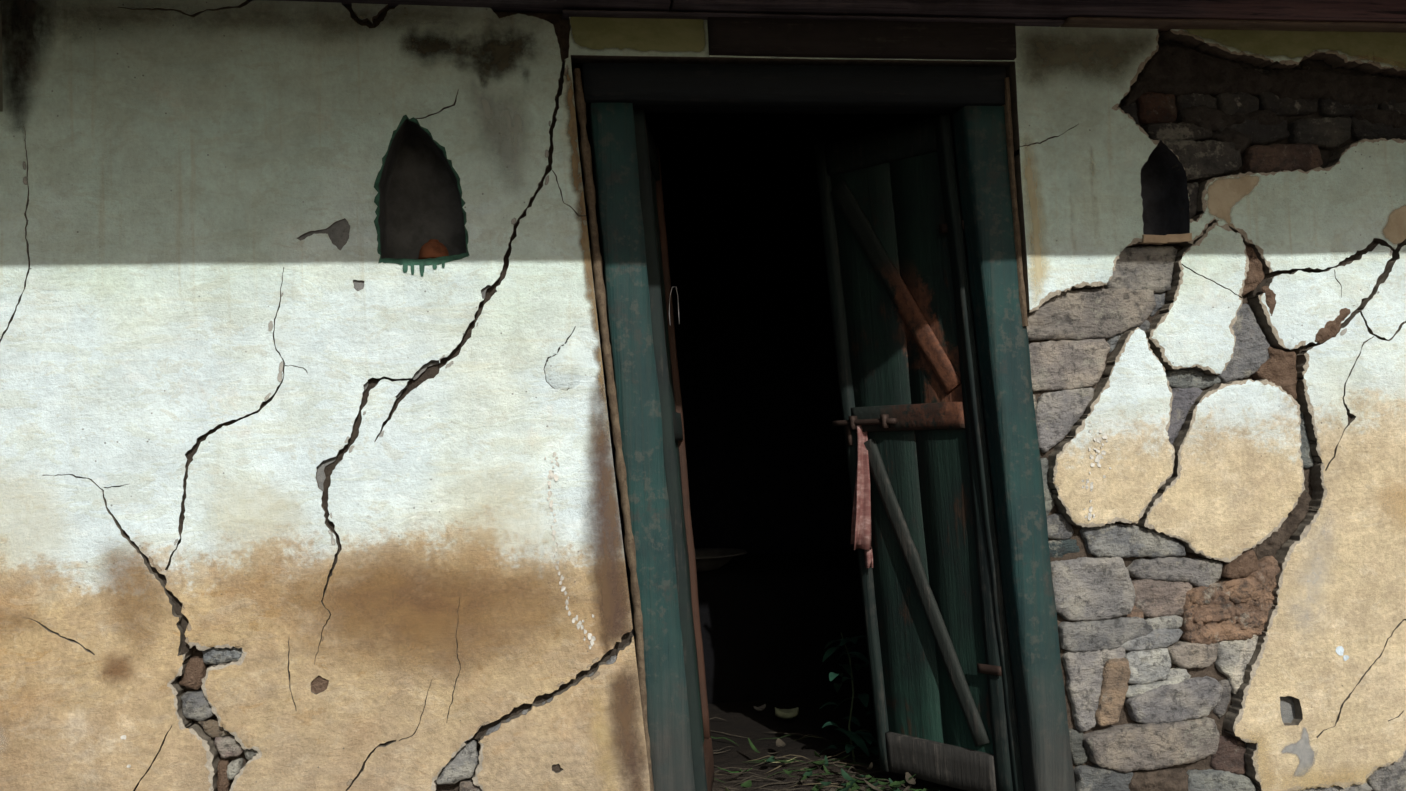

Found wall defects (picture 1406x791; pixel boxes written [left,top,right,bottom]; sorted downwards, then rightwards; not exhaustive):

damp [404,31,532,84]
crack [0,127,30,342]
flaking render [297,218,350,251]
crack [42,267,307,656]
crack [288,60,586,711]
flaking render [1027,35,1406,791]
crack [1182,238,1406,471]
flaking render [178,645,258,791]
damp [304,574,548,658]
flaking render [436,738,482,791]
crack [346,598,633,791]
damp [611,674,643,791]